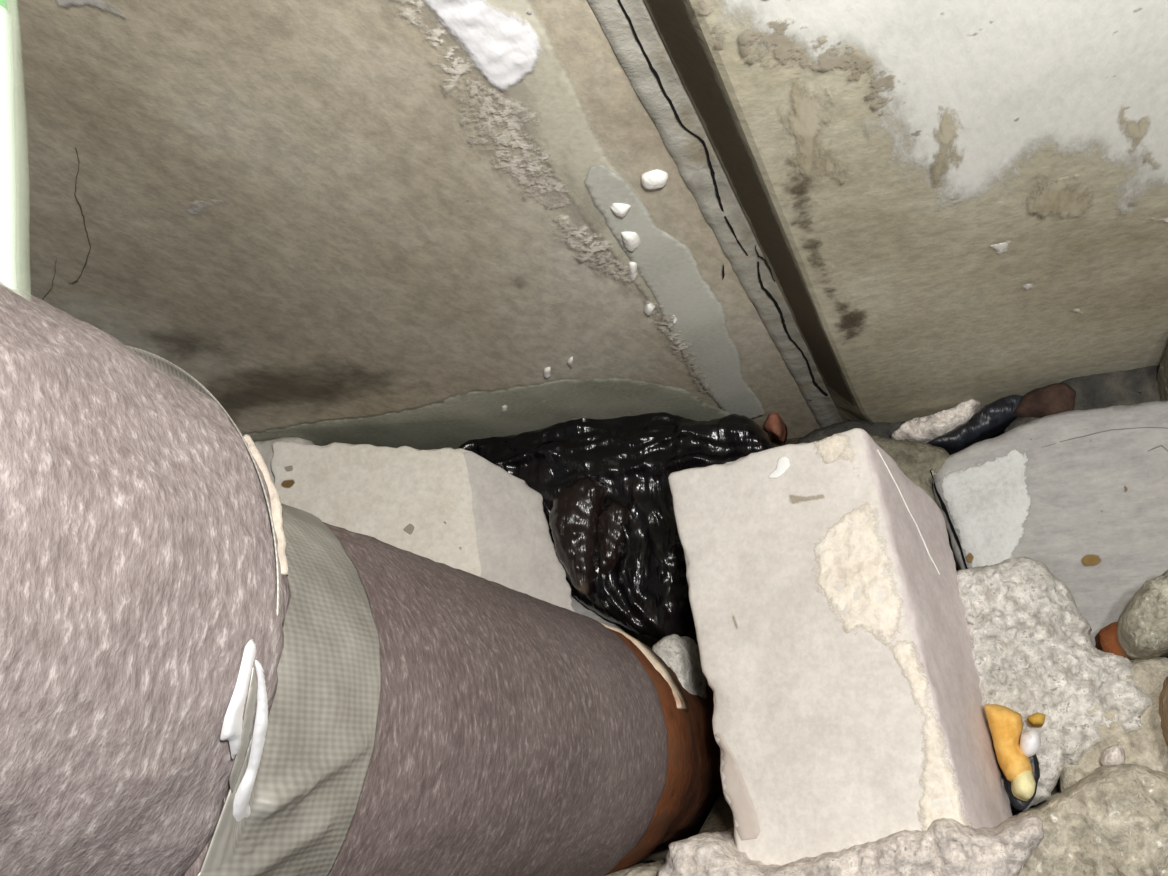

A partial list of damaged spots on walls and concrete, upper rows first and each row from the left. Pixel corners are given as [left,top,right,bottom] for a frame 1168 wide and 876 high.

crack [42,147,91,300]
leakage [220,375,342,409]
efflorescence [396,0,642,285]
leakage [643,0,854,406]
leakage [838,304,865,339]
peeling [691,0,1168,219]
peeling [991,241,1011,253]